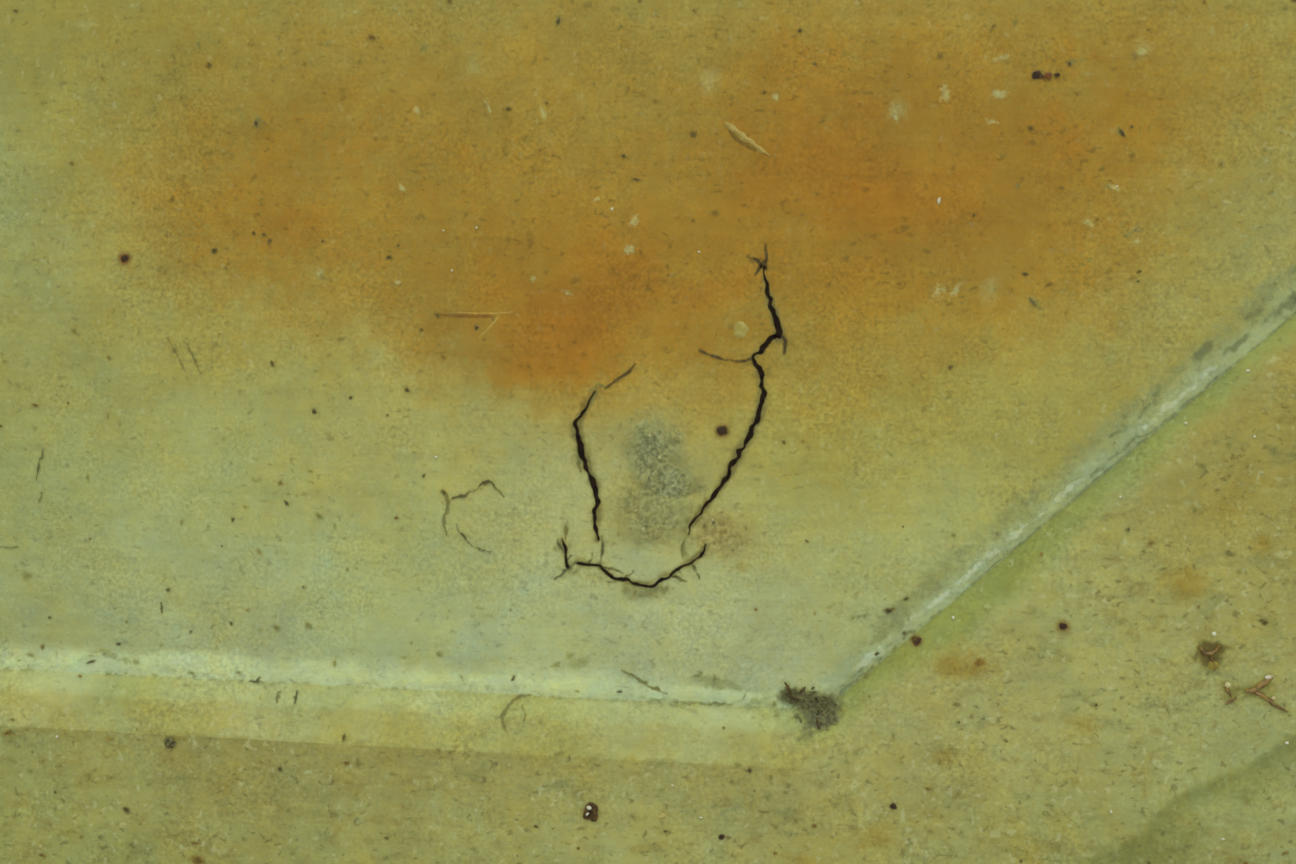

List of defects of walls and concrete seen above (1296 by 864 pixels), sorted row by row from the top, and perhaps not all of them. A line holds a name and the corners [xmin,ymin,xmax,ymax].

rust [144,11,1198,398]
crack [553,243,787,598]